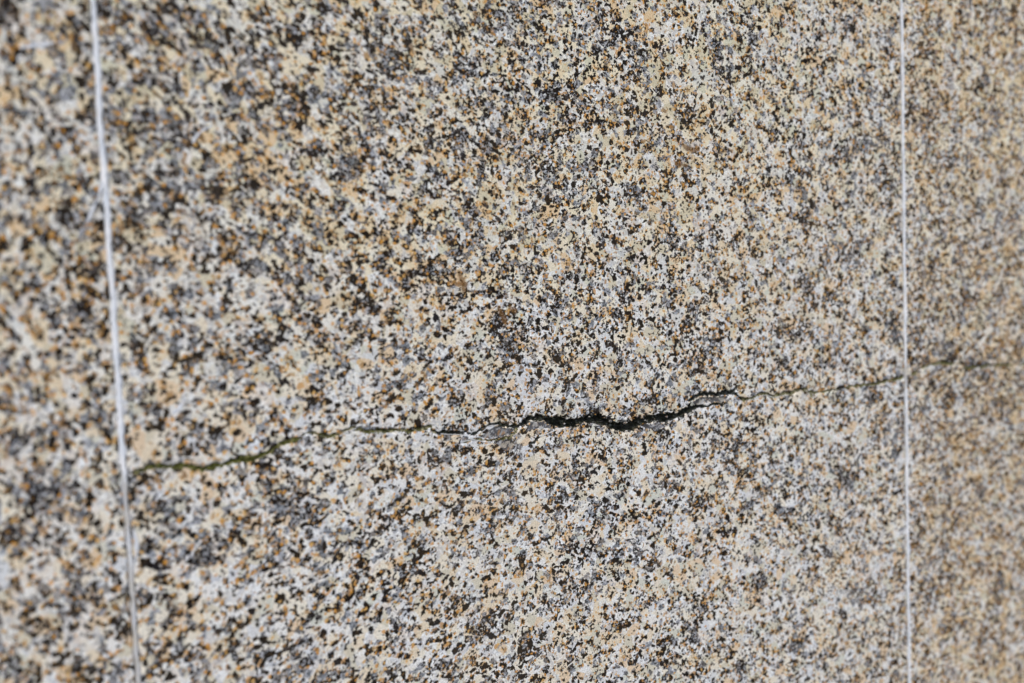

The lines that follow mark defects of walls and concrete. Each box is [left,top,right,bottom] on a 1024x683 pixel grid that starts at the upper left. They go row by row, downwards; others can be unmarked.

crack [133,360,1024,474]